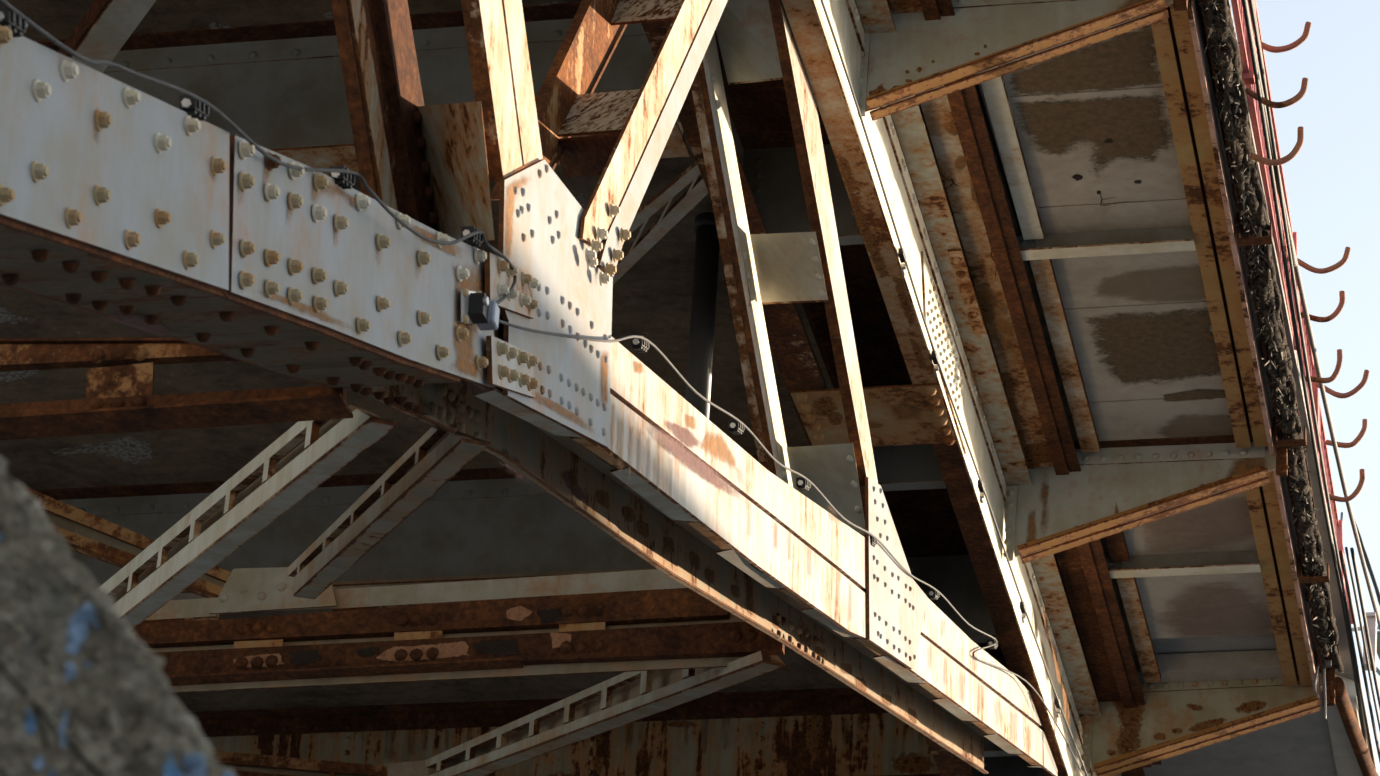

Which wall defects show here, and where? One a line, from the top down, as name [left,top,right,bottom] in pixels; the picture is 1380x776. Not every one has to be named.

corrosion [869,60,935,96]
water stain [1011,24,1172,172]
corrosion [834,156,927,369]
water stain [1087,267,1233,438]
peeling [233,649,323,667]
peeling [356,639,520,662]
peeling [506,605,571,648]
corrosion [1107,700,1266,756]